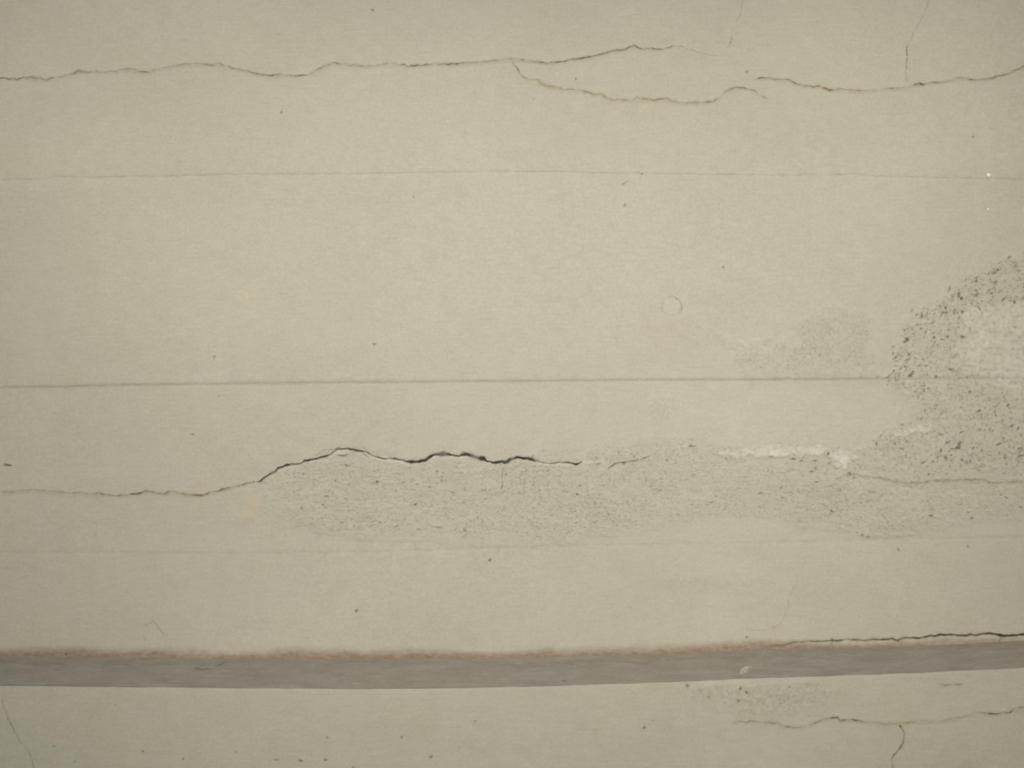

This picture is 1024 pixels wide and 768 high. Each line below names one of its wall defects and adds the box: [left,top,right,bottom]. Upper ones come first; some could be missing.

crack [0,43,1024,106]
crack [0,448,581,499]
flaking render [260,429,1024,561]
crack [834,632,1024,641]
crack [733,704,1024,756]